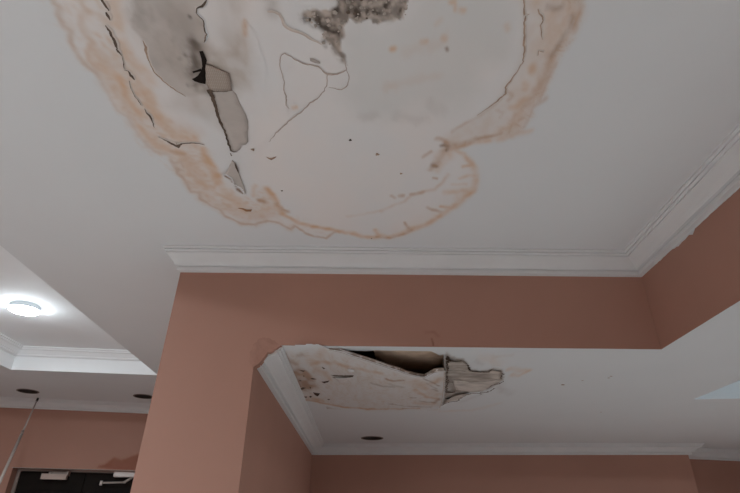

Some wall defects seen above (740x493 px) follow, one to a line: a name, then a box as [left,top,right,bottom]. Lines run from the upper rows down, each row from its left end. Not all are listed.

crack [101,0,205,148]
peeling [108,0,268,151]
peeling [222,160,246,195]
crack [267,10,349,142]
leakage [33,0,594,245]
crack [477,0,545,116]
peeling [441,350,507,406]